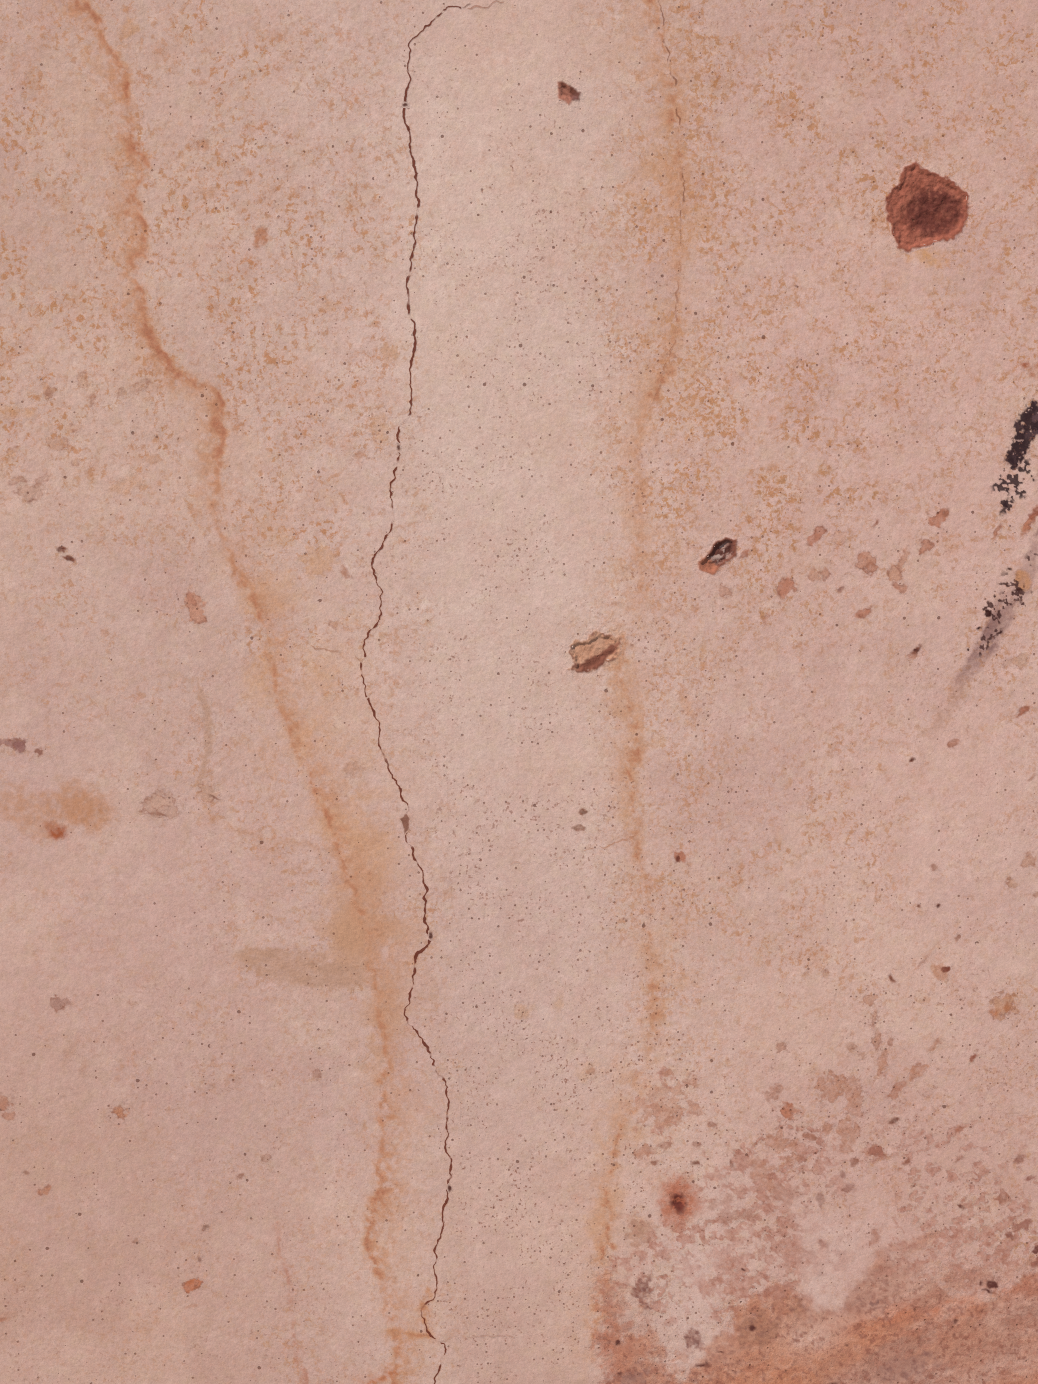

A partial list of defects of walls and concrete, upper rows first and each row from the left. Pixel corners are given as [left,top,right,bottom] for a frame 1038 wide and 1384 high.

flaking render [551,75,587,111]
crack [653,0,685,403]
water stain [988,360,1038,521]
water stain [0,0,471,1384]
crack [306,0,637,1384]
flaking render [560,623,630,679]
water stain [536,0,751,1384]
spalling [691,531,753,599]
peeling [761,565,845,626]
peeling [853,605,877,620]
peeling [804,506,950,595]